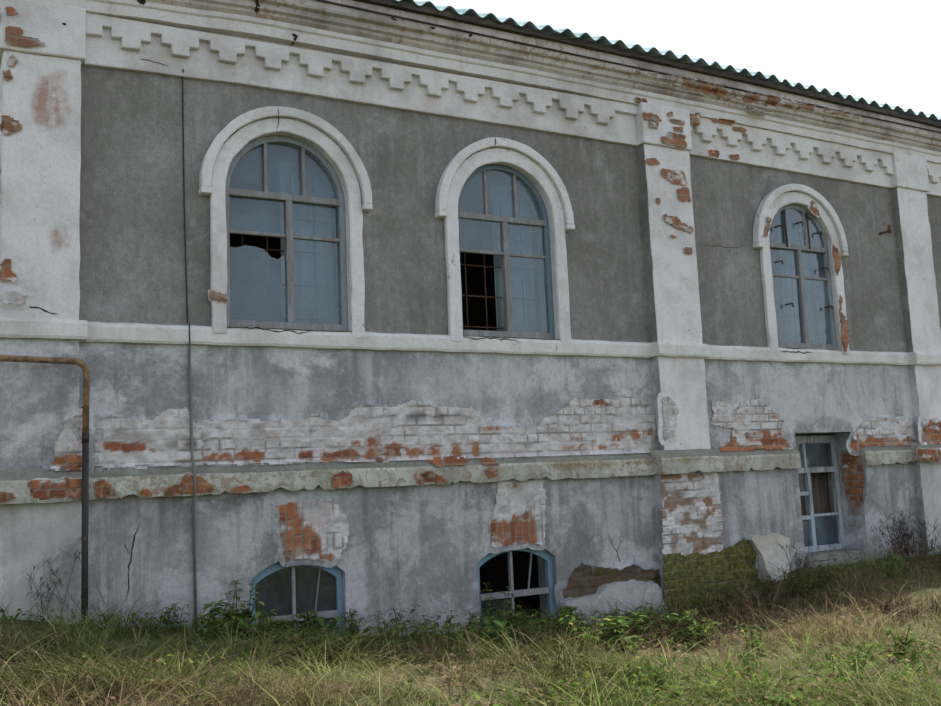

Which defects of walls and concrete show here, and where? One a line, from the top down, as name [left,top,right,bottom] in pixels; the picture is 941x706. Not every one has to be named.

peeling [0,6,47,84]
peeling [0,114,23,137]
peeling [634,97,747,149]
spalling [631,69,861,120]
peeling [645,157,692,202]
peeling [654,197,694,256]
spalling [41,389,682,475]
spalling [707,393,794,452]
spalling [840,412,941,512]
spalling [270,492,353,568]
spalling [483,477,550,554]
spalling [554,472,767,610]